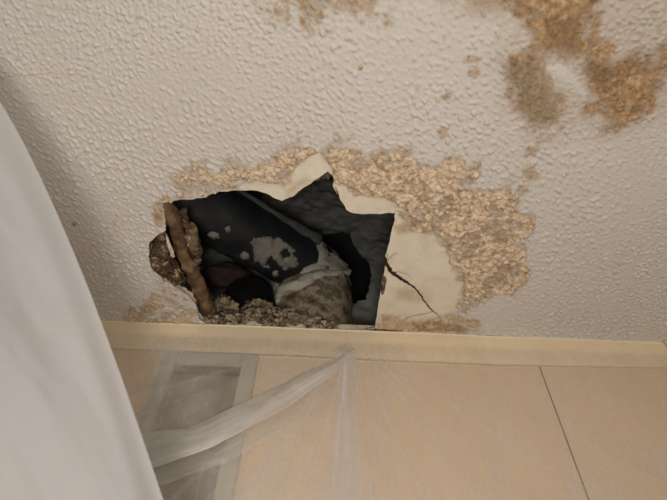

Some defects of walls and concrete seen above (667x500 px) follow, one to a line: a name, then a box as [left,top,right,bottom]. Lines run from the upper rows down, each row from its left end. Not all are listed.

leakage [503,0,667,132]
flaking render [149,153,467,331]
crack [376,252,441,331]